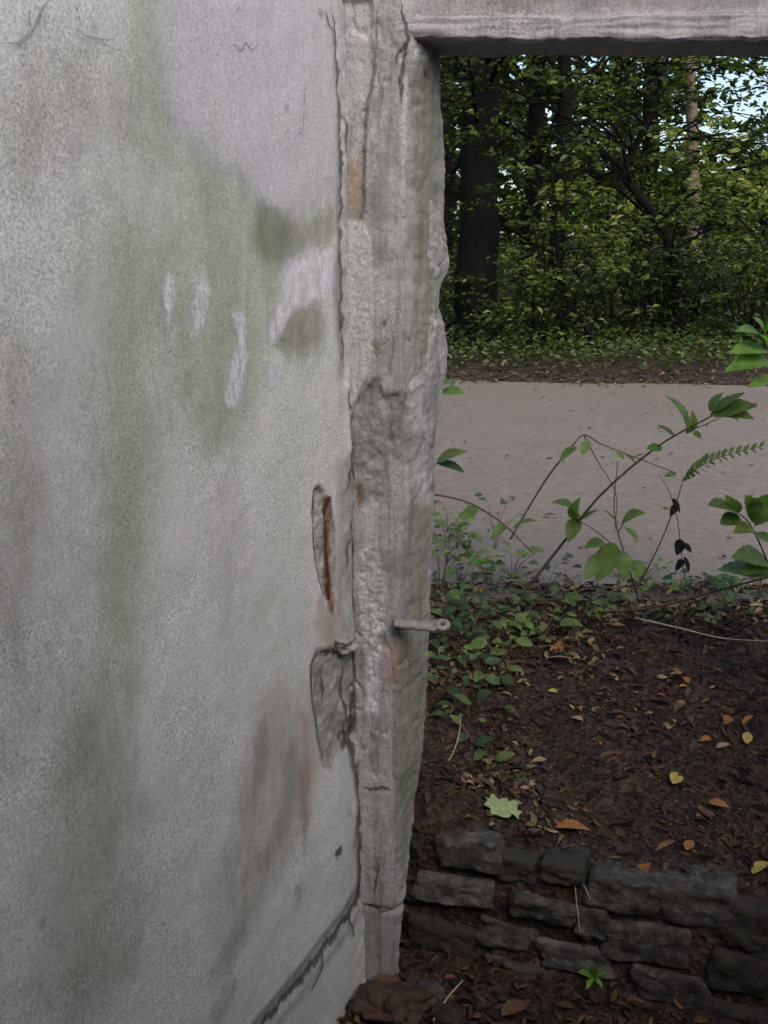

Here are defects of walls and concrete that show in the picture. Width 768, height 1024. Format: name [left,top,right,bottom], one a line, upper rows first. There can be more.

crack [3,5,46,44]
crack [325,1,410,420]
spalling [312,486,336,611]
crack [346,454,355,577]
crack [261,655,390,1024]